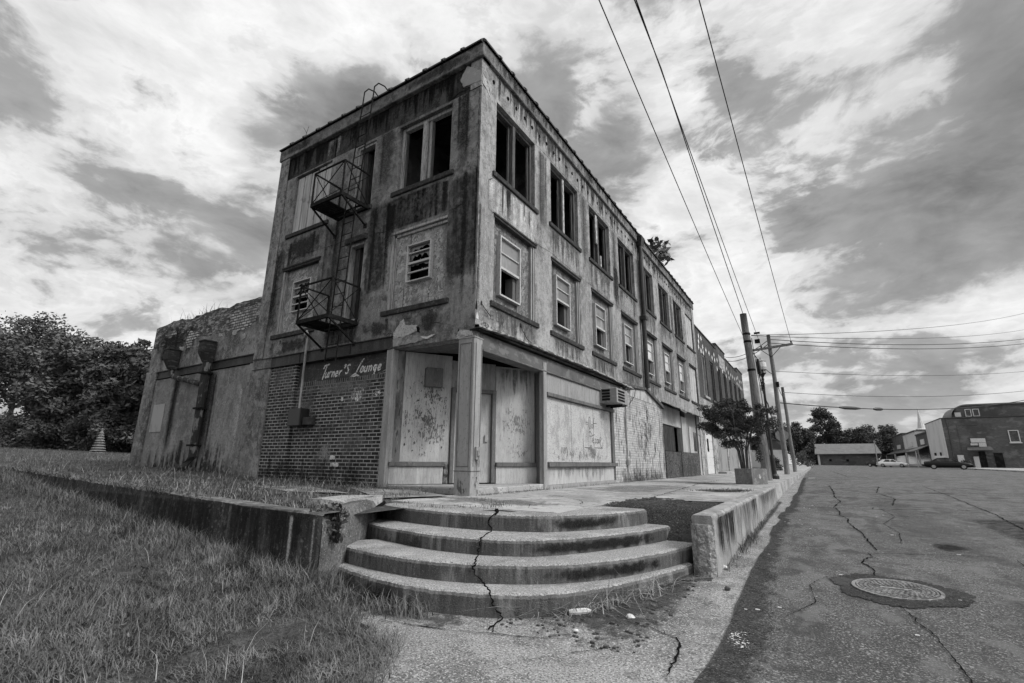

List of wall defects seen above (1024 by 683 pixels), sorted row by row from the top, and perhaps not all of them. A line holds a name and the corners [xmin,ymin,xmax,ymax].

flaking render [461,66,490,97]
damp [325,168,481,343]
damp [158,325,194,360]
flaking render [393,312,435,347]
damp [148,373,243,473]
damp [229,506,315,562]
crack [472,508,507,630]